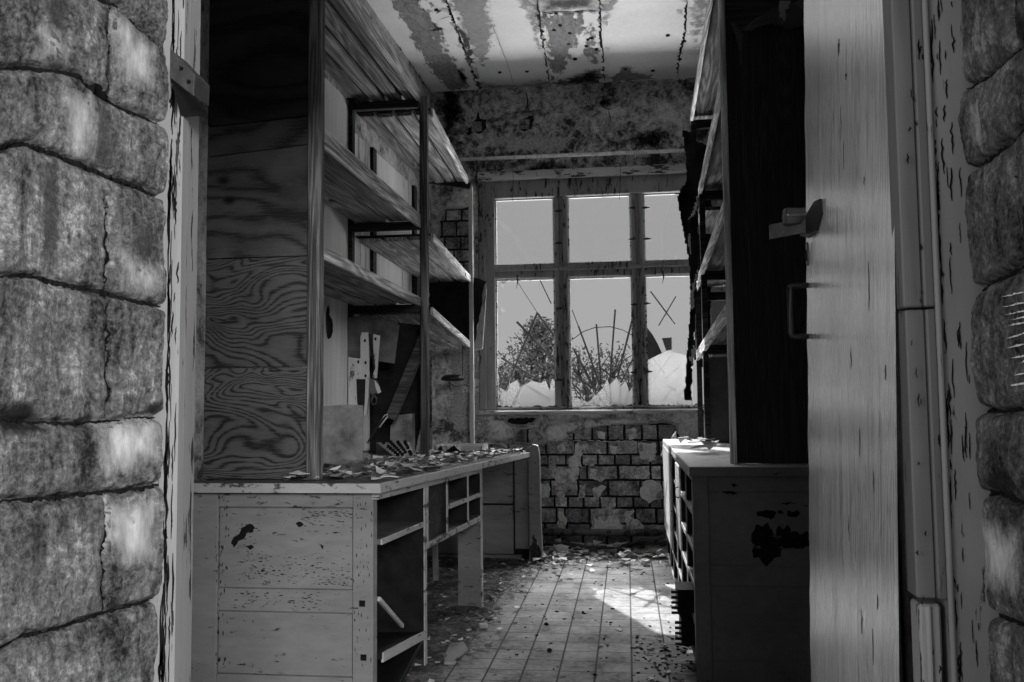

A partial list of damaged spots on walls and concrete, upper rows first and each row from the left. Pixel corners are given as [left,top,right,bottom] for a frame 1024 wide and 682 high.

peeling [392,0,485,90]
leakage [442,91,459,131]
crack [436,0,479,90]
leakage [529,161,569,170]
peeling [527,0,613,87]
leakage [487,67,654,88]
leakage [632,131,665,148]
crack [676,3,688,77]
spalling [437,205,477,278]
spalling [282,415,683,545]